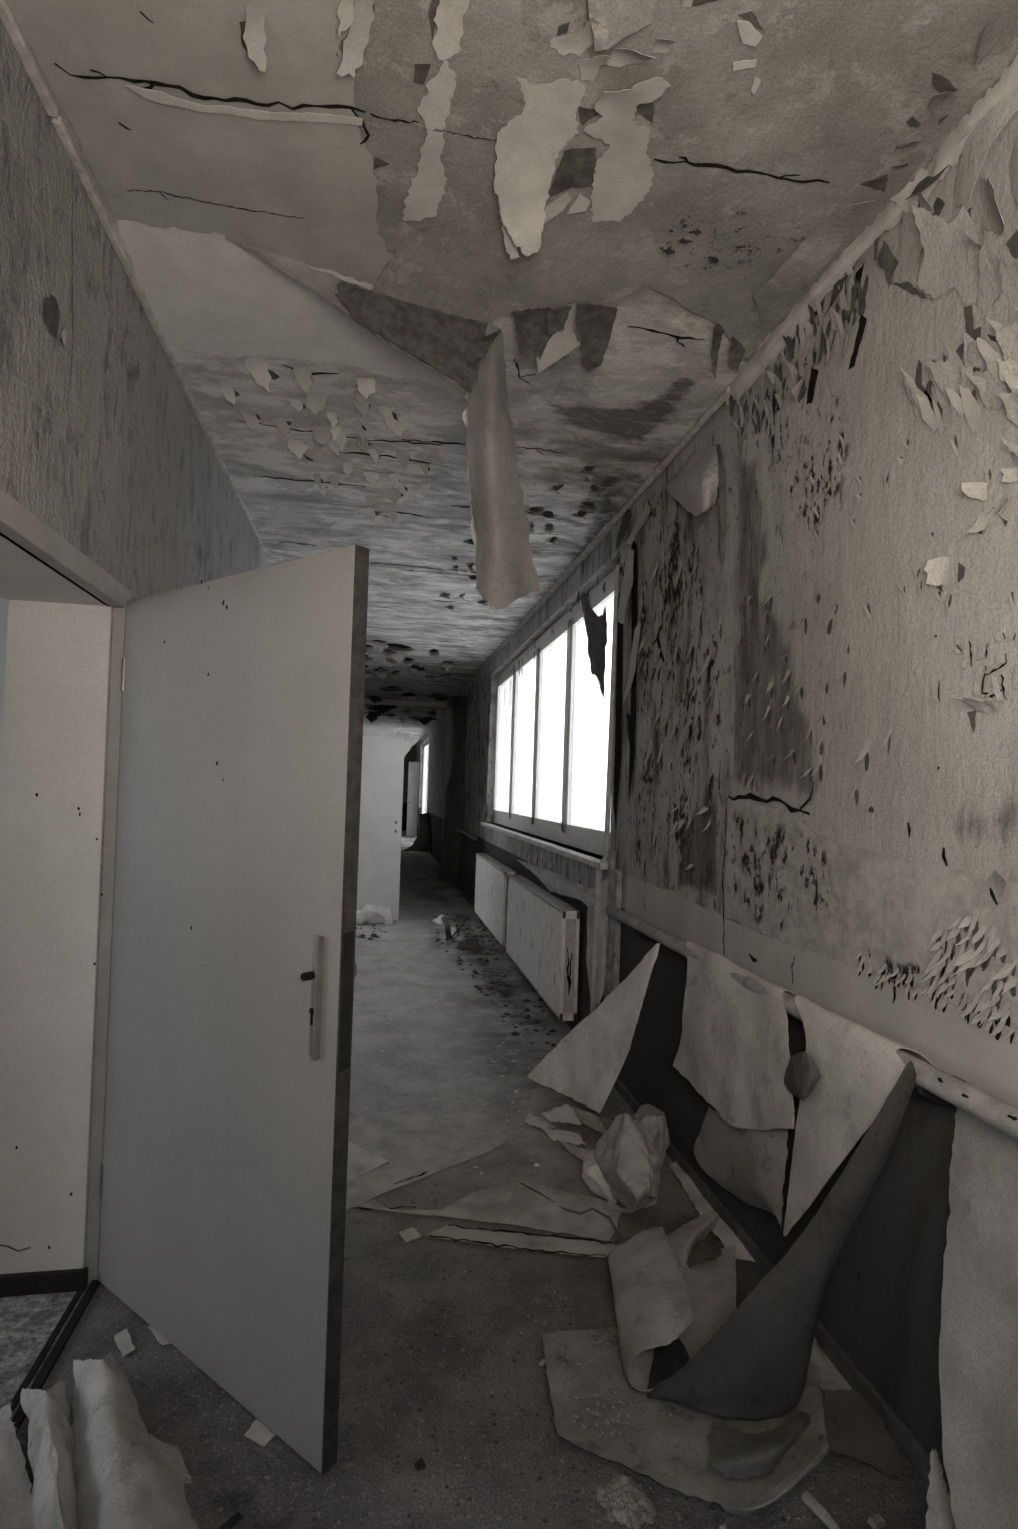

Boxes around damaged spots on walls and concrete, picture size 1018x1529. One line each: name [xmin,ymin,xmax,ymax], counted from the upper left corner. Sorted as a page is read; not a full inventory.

crack [54,63,497,144]
crack [654,156,830,184]
peeling [7,0,1018,534]
peeling [364,640,454,725]
crack [722,781,814,984]